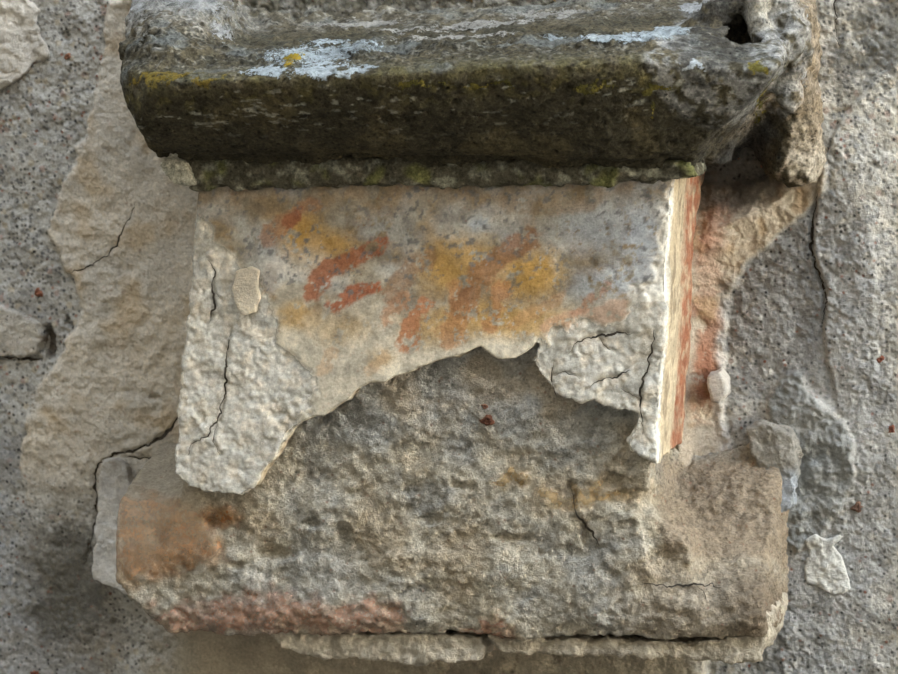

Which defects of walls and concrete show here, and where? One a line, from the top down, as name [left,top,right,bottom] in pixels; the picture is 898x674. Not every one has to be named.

crack [808,195,828,322]
spalling [479,404,495,426]
flaking render [535,302,669,464]